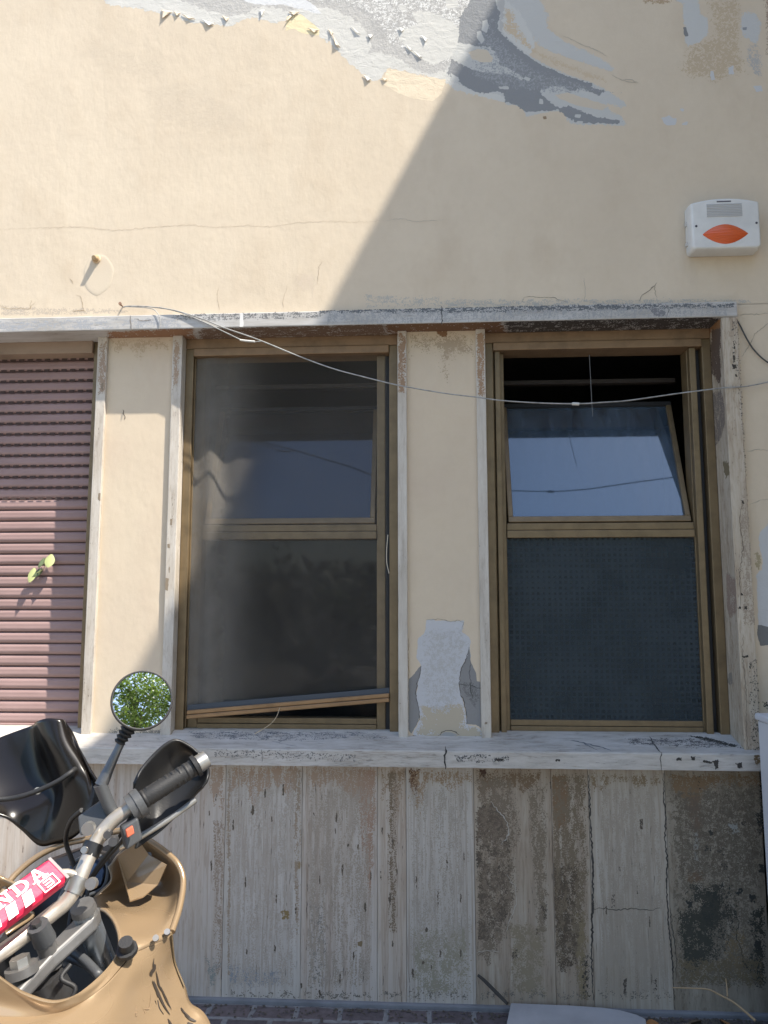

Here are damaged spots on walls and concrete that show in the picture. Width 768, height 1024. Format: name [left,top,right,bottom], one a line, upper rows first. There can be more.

spalling [104,0,626,126]
peeling [676,0,709,47]
peeling [738,524,768,646]
peeling [408,619,487,736]
water stain [189,731,767,1001]
crack [588,737,677,1000]